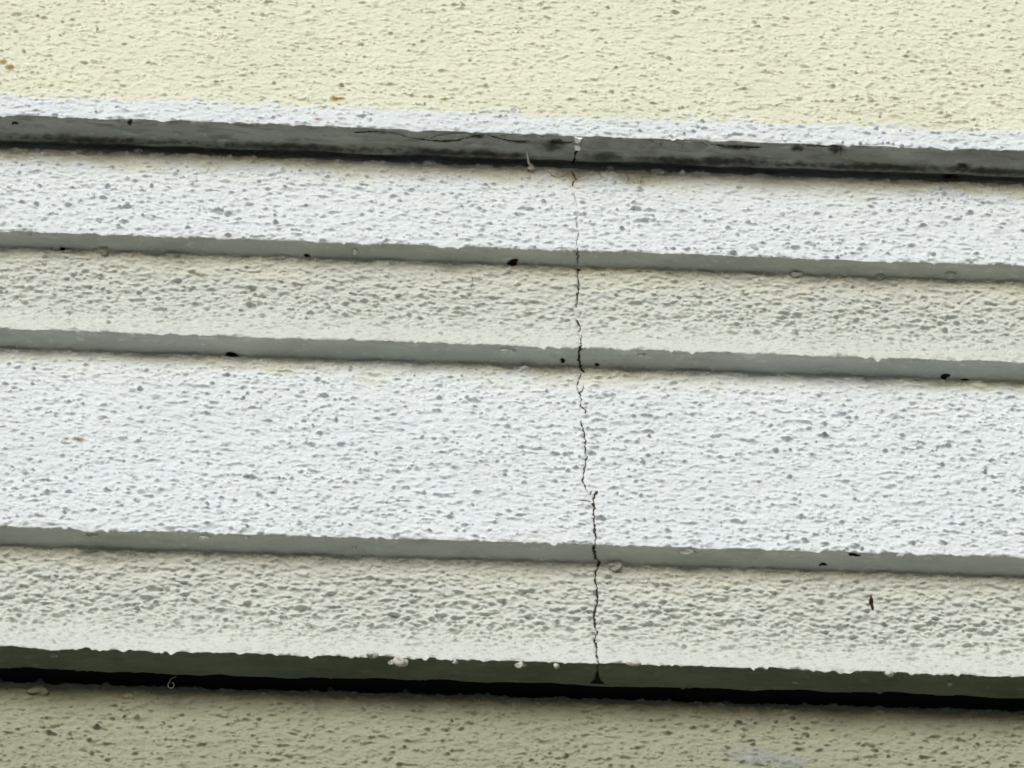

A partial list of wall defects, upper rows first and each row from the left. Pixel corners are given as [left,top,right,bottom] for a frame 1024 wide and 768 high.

crack [354,131,514,155]
crack [541,136,650,684]